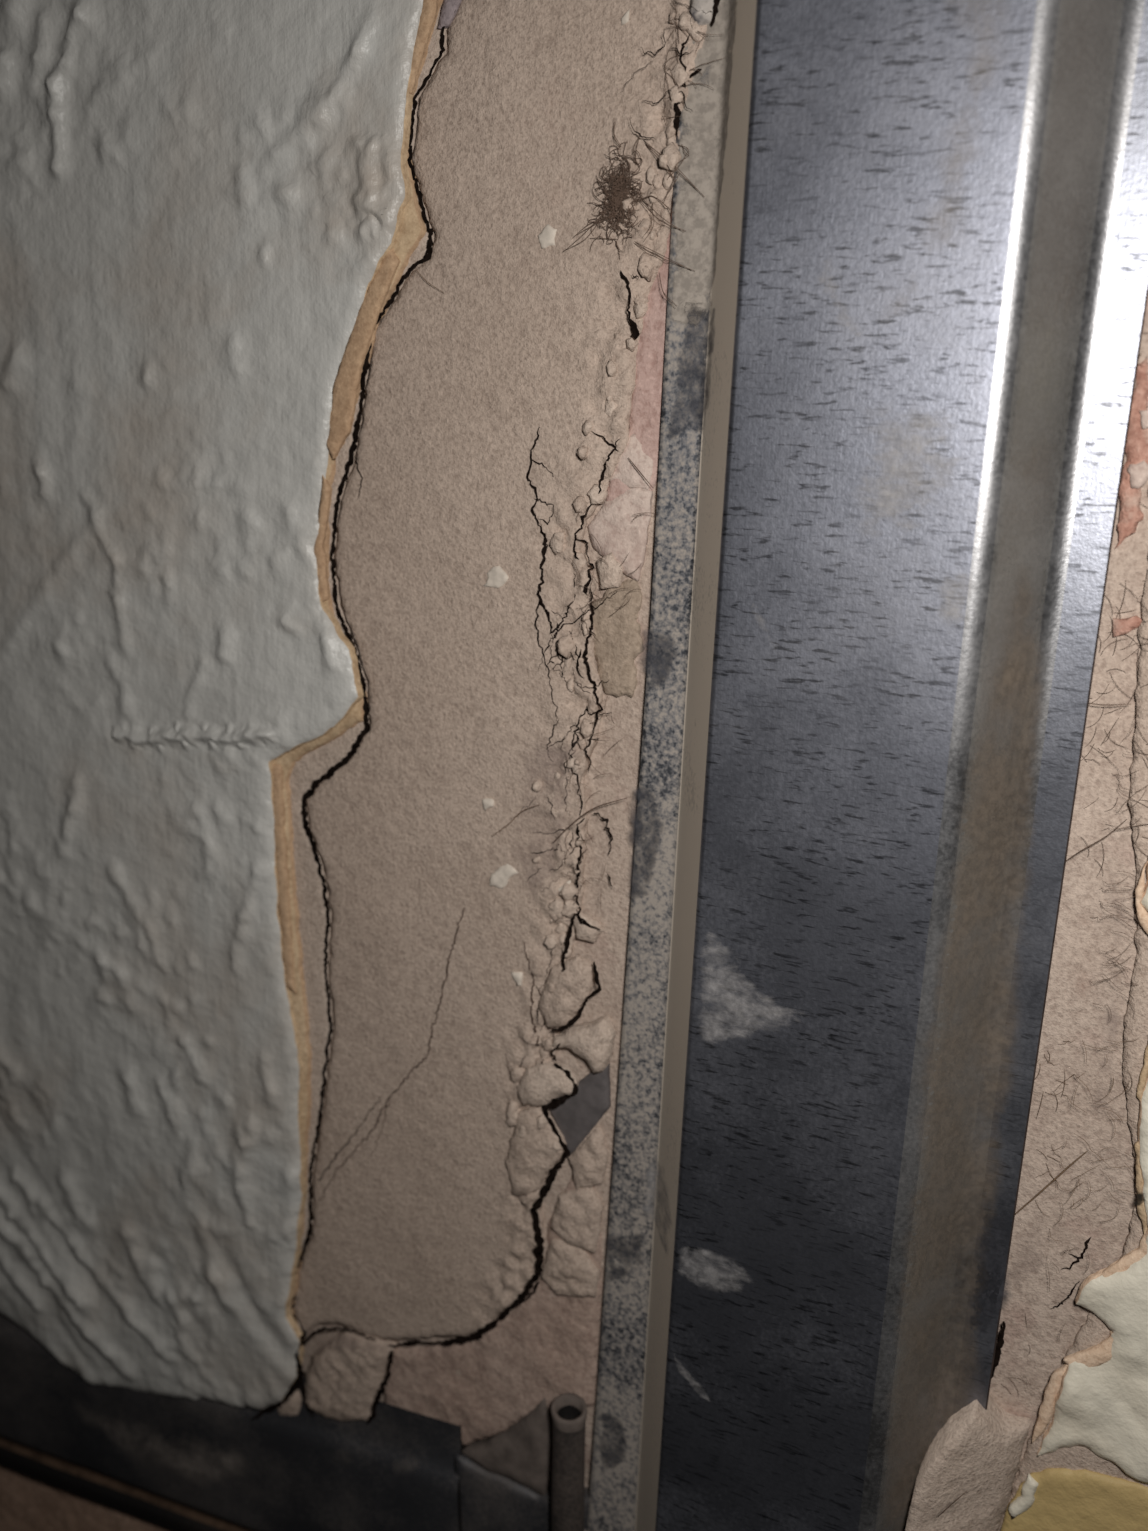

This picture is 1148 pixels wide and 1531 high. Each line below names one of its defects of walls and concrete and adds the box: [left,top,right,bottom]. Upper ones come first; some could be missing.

crack [619,0,720,139]
peeling [314,0,462,616]
crack [620,271,640,339]
flaking render [587,201,673,698]
crack [251,10,619,1423]
peeling [272,691,368,1188]
peeling [1135,860,1148,934]
flaking render [384,1125,609,1445]
crack [1051,1237,1091,1309]
peeling [1032,1044,1148,1484]
peeling [1008,1473,1039,1519]